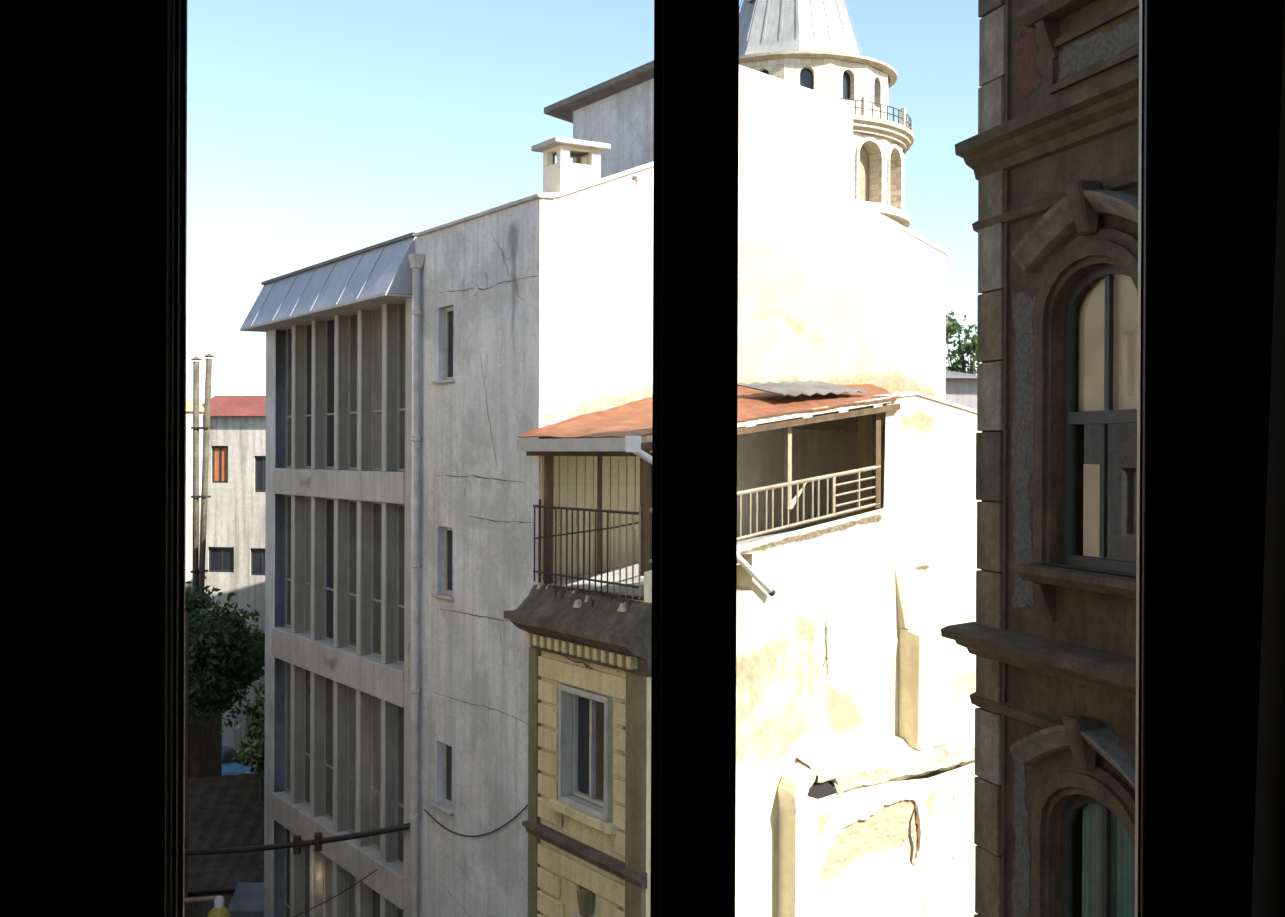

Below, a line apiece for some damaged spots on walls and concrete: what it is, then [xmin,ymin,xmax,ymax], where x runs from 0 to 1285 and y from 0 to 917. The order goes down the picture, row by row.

crack [439,233,537,299]
peeling [738,239,939,398]
peeling [777,416,858,432]
water stain [736,644,783,688]
water stain [829,688,862,732]
spalling [821,799,921,884]